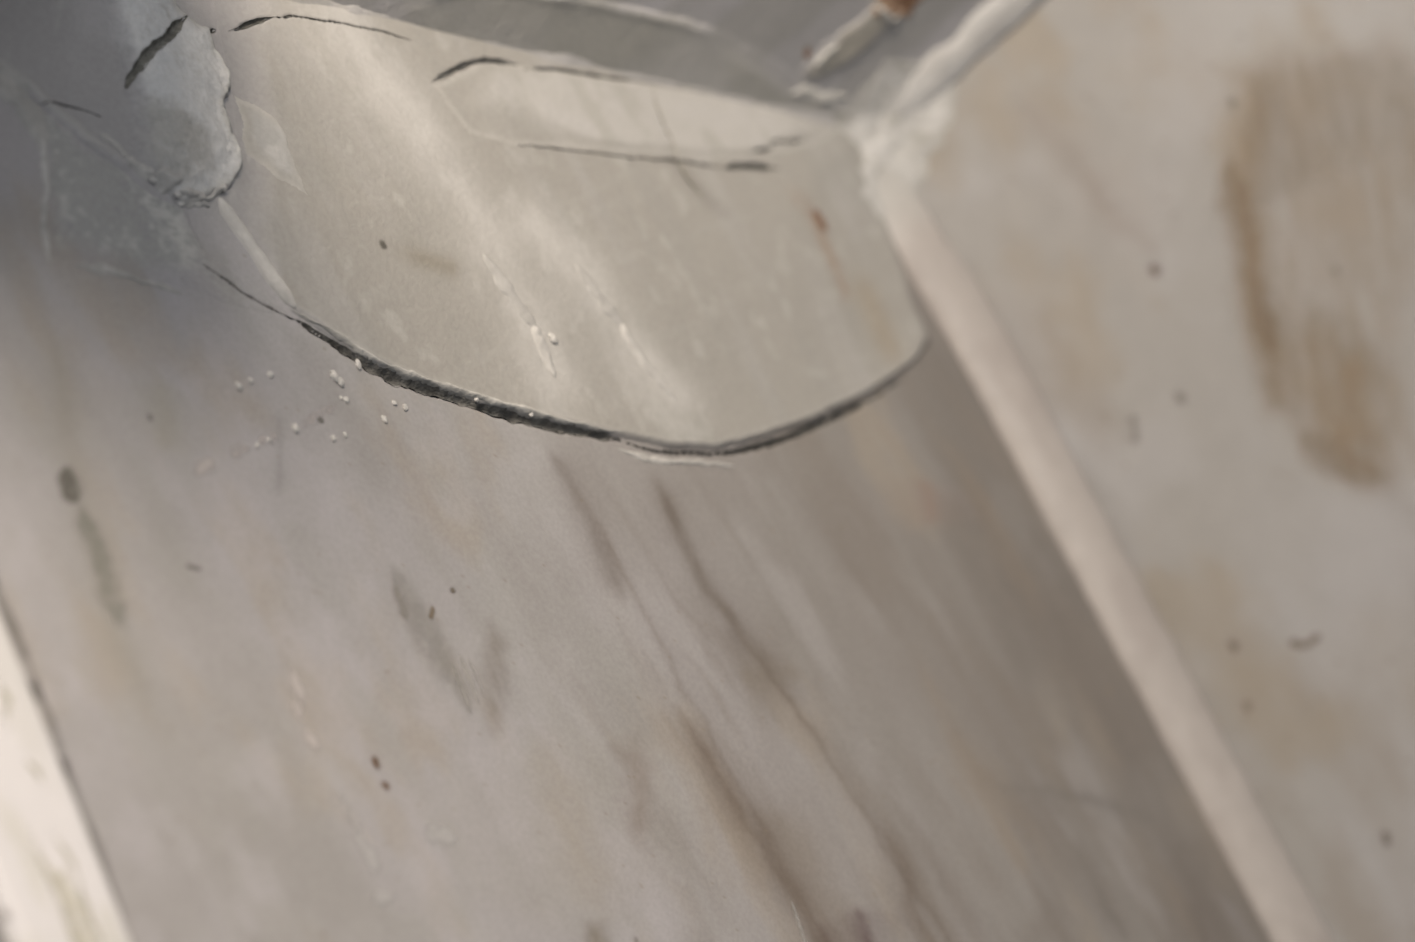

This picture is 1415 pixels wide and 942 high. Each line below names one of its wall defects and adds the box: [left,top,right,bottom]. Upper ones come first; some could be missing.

crack [38,101,101,117]
flaking render [99,0,308,208]
crack [124,15,410,89]
crack [436,57,810,195]
rust [871,0,921,23]
crack [203,264,900,456]